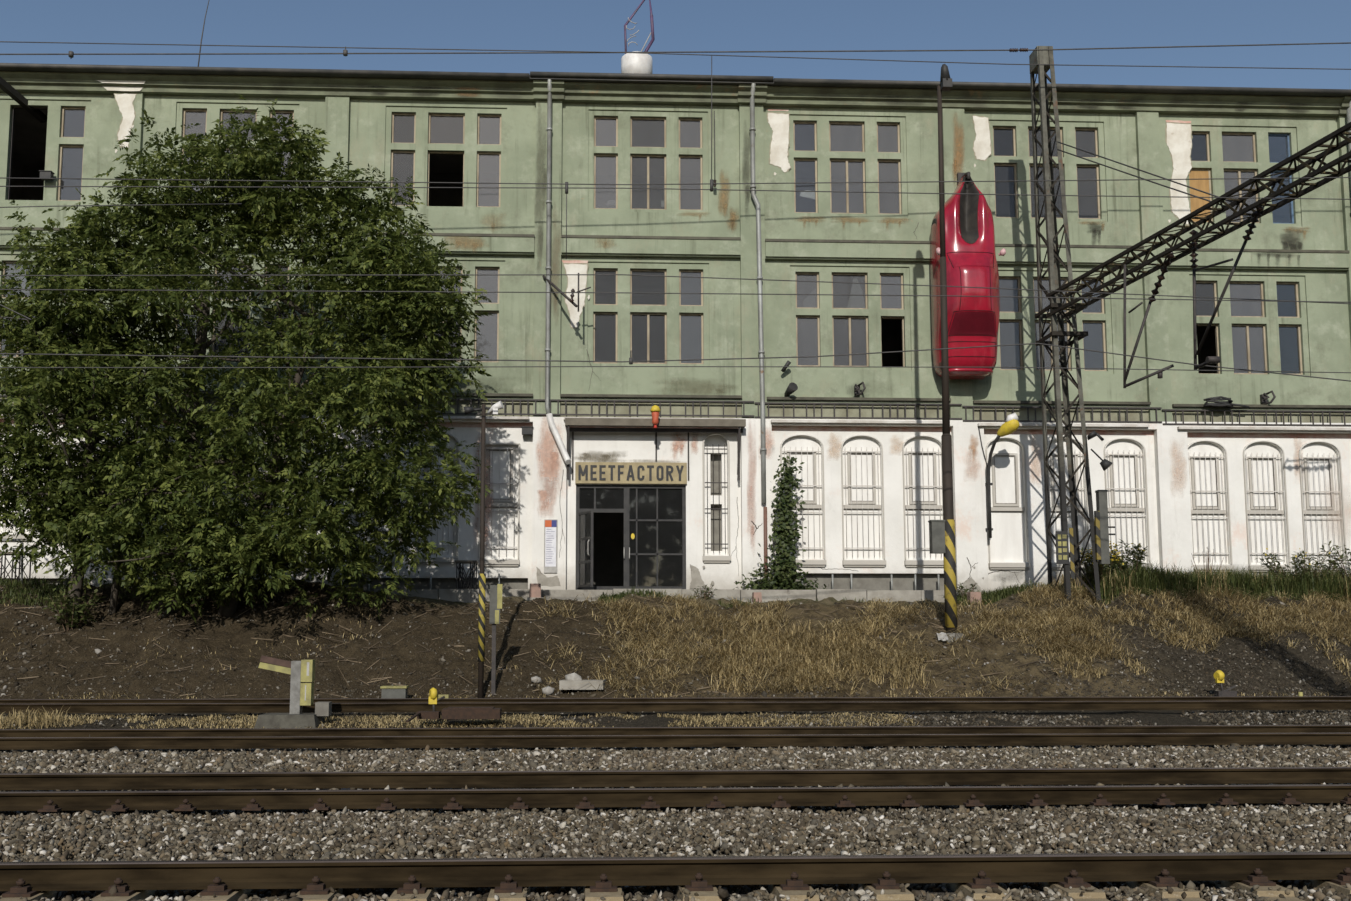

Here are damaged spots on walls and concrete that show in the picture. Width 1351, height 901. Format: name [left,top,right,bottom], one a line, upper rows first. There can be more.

flaking render [97,80,145,153]
flaking render [767,109,791,175]
flaking render [972,115,992,167]
flaking render [1165,120,1193,226]
flaking render [562,260,590,329]